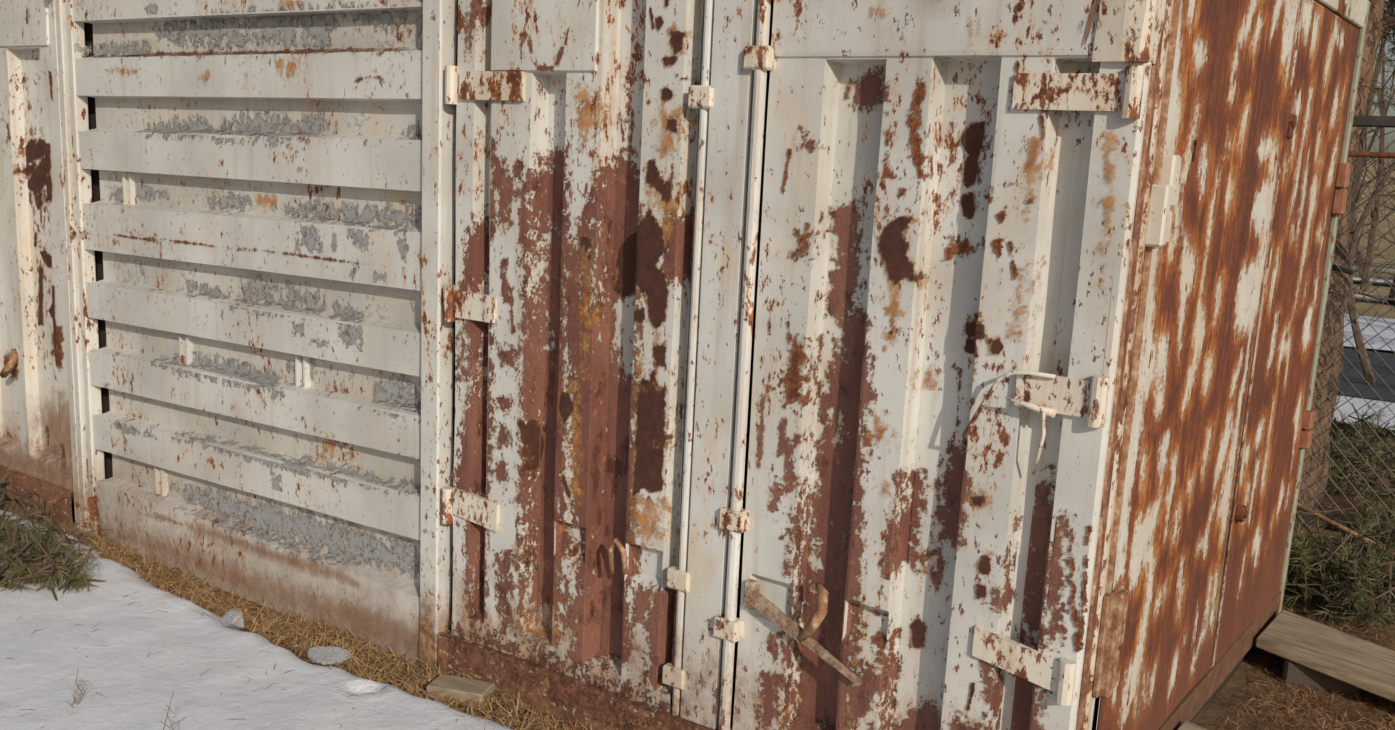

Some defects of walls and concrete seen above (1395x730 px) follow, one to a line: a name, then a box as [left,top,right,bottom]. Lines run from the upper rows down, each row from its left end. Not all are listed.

peeling [74,0,423,58]
corrosion [13,138,52,210]
corrosion [34,230,66,371]
peeling [135,109,337,148]
peeling [150,274,364,406]
peeling [272,197,422,284]
peeling [358,370,421,424]
corrosion [518,0,699,551]
corrosion [878,77,933,351]
corrosion [941,110,1080,358]
corrosion [1097,0,1360,730]
peeling [112,420,421,582]